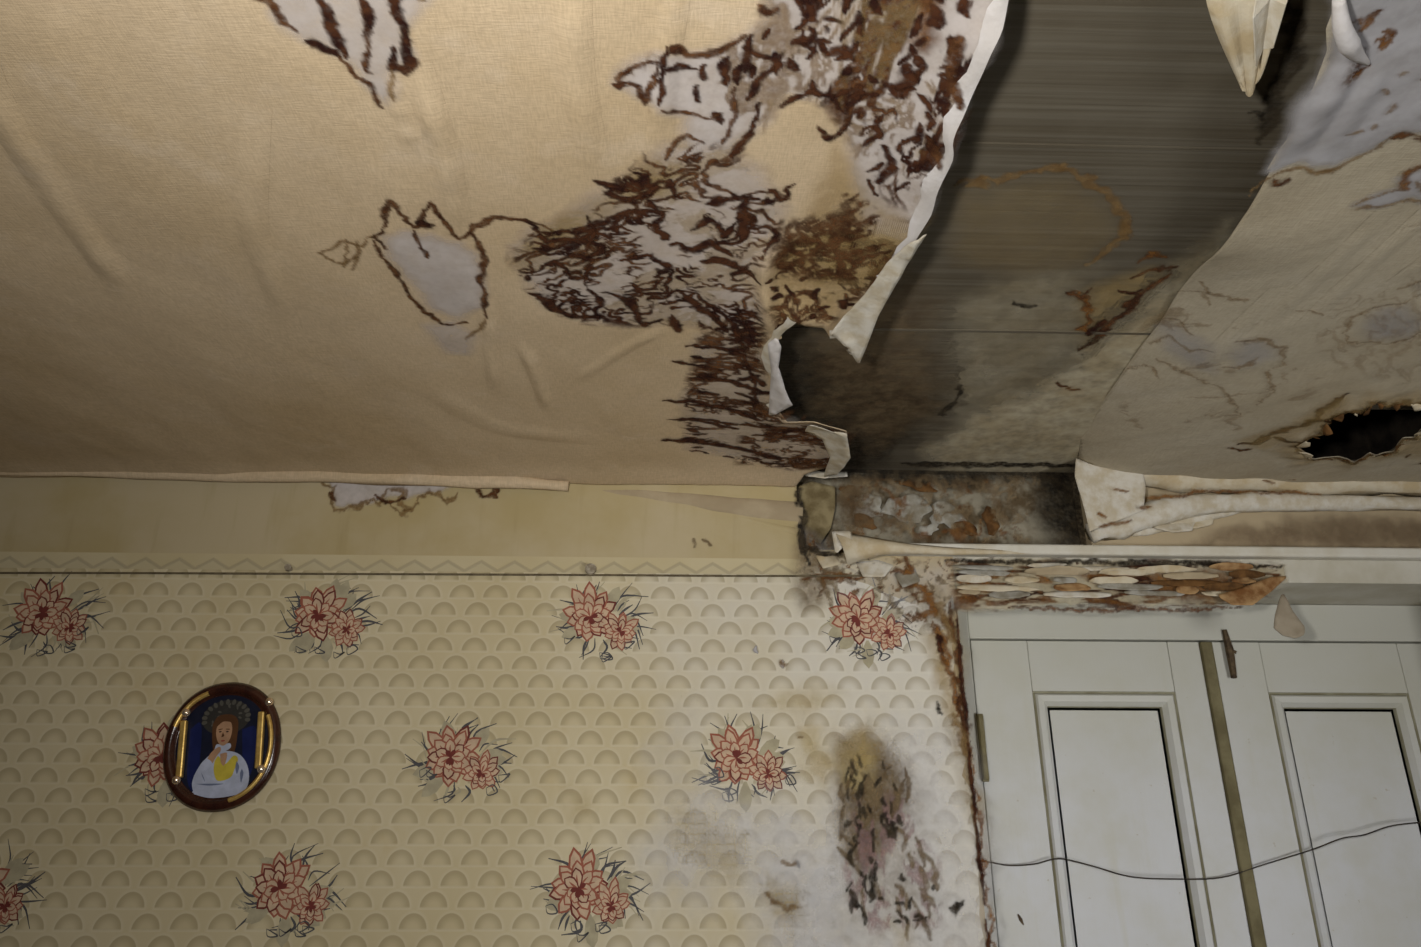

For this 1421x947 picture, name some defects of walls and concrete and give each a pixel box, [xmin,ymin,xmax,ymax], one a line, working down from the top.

peeling [1206,0,1288,97]
water stain [321,0,1219,667]
peeling [1296,403,1421,459]
peeling [797,471,1286,613]